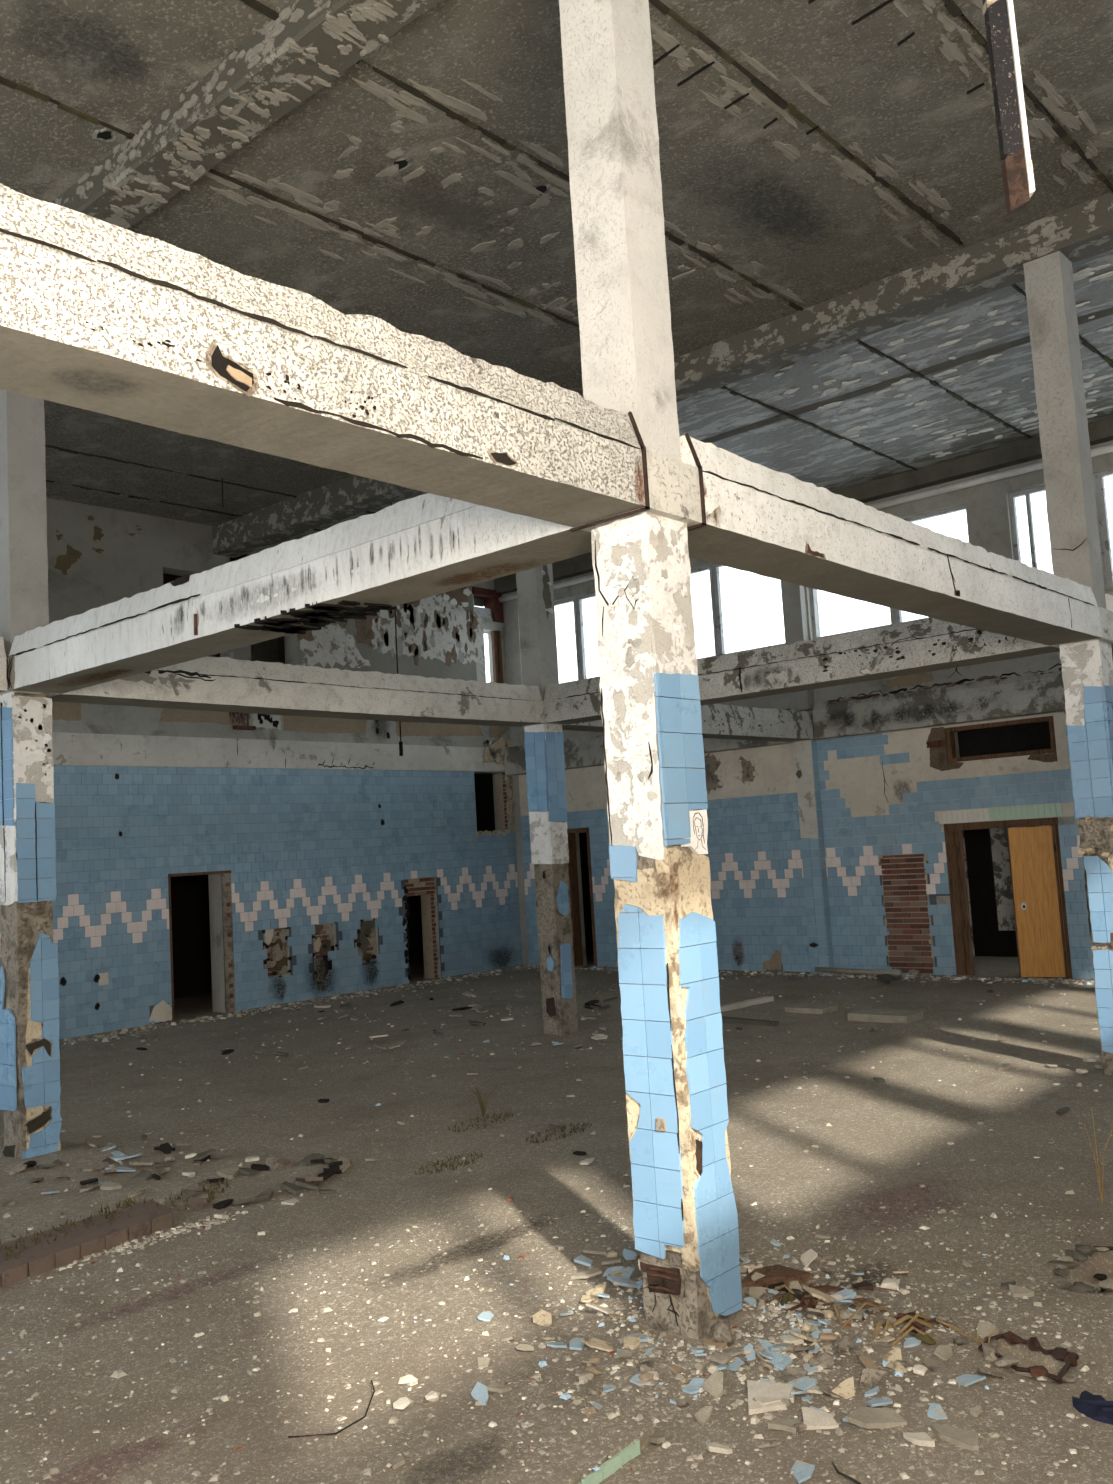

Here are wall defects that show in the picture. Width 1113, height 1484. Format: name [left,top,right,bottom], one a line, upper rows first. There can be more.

peeling [76,0,579,325]
peeling [650,19,976,286]
spalling [196,339,314,400]
crack [0,228,640,449]
crack [274,398,483,459]
peeling [603,529,693,745]
peeling [699,721,978,838]
spalling [312,918,377,991]
spalling [1,1106,52,1157]
spalling [626,1093,666,1139]
spalling [693,1135,704,1178]
spalling [638,1259,685,1297]